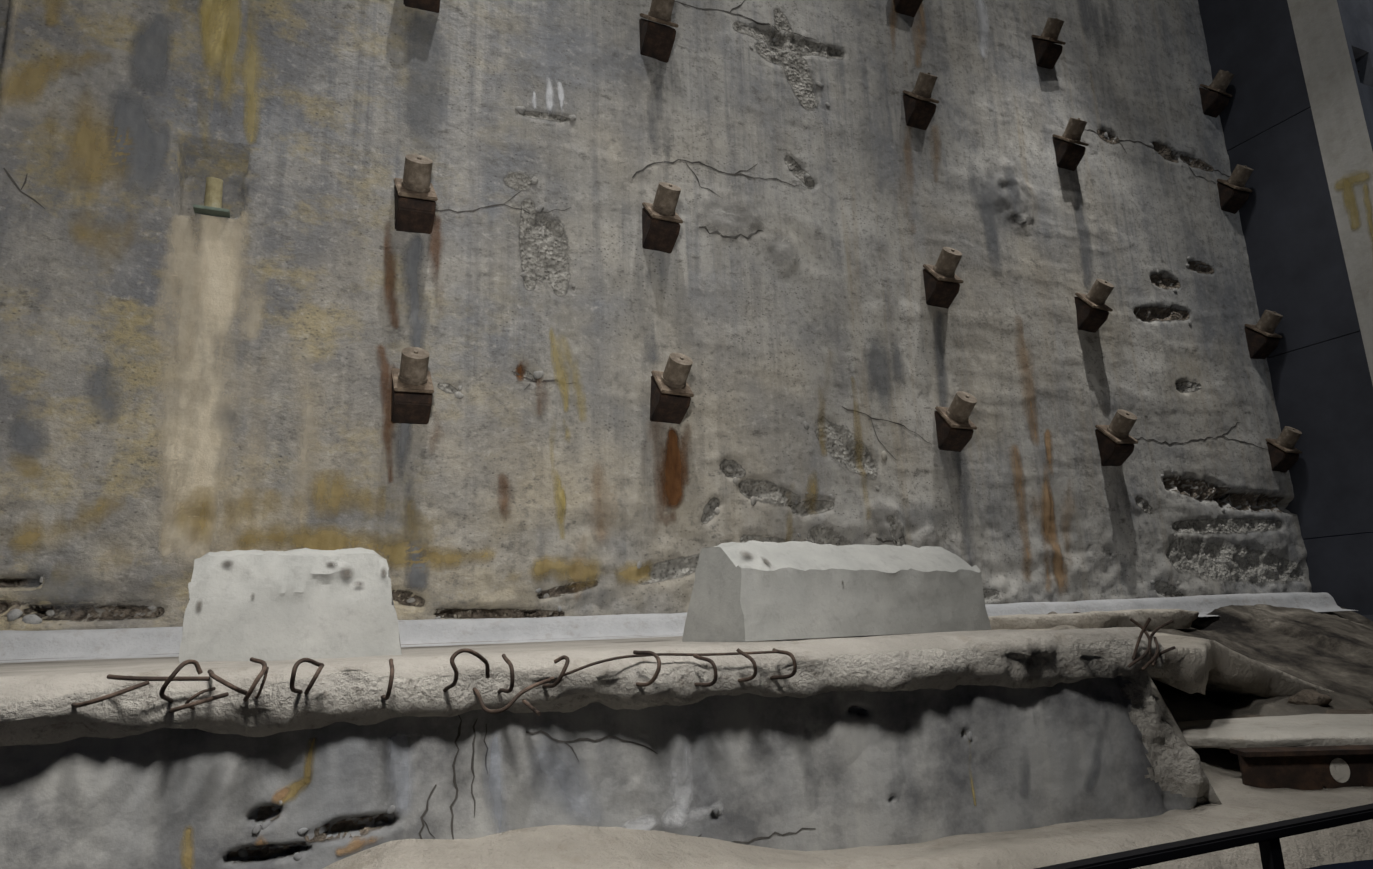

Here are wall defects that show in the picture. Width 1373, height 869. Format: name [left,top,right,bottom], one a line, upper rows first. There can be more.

spalling [733,9,844,111]
crack [632,159,809,198]
crack [1085,129,1230,184]
spalling [504,172,575,296]
spalling [1133,257,1214,326]
spalling [636,554,700,584]
corrosion [661,428,687,507]
spalling [701,498,720,524]
spalling [720,460,851,565]
spalling [803,418,887,491]
corrosion [1029,386,1067,589]
spalling [1150,470,1303,597]